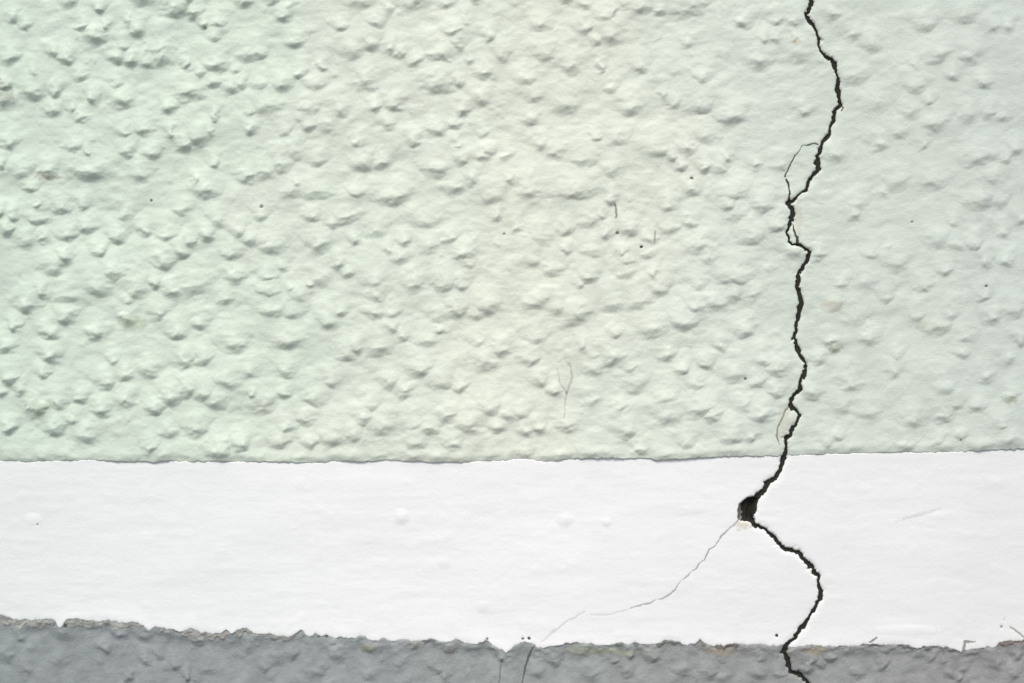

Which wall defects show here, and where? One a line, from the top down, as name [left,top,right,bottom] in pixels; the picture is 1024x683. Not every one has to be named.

crack [498,0,844,683]